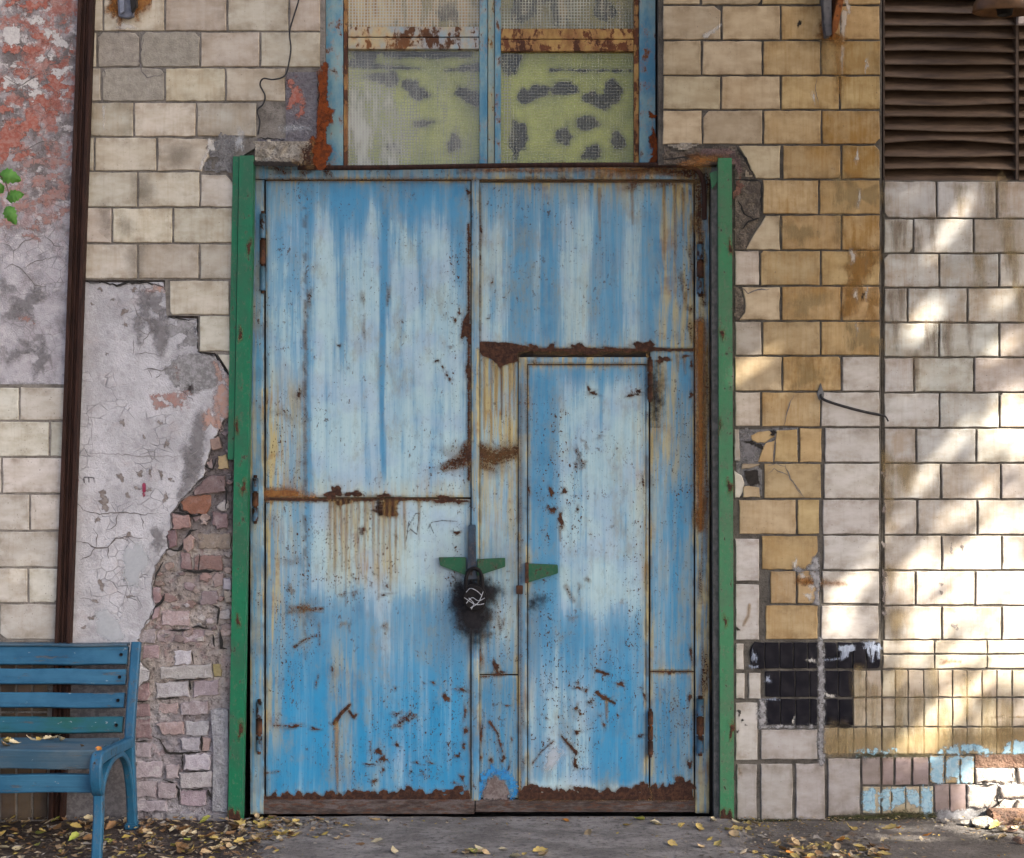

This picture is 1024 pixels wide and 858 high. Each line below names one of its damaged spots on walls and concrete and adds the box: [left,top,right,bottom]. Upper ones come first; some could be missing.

peeling [0,0,75,242]
corrosion [309,62,336,170]
spalling [662,143,763,253]
corrosion [426,188,528,481]
corrosion [622,111,710,531]
crack [78,405,203,636]
flaking render [116,361,246,821]
corrosion [257,410,405,699]
spalling [719,420,798,498]
peeling [730,637,856,766]
peeling [863,640,883,662]
spalling [861,741,1024,816]